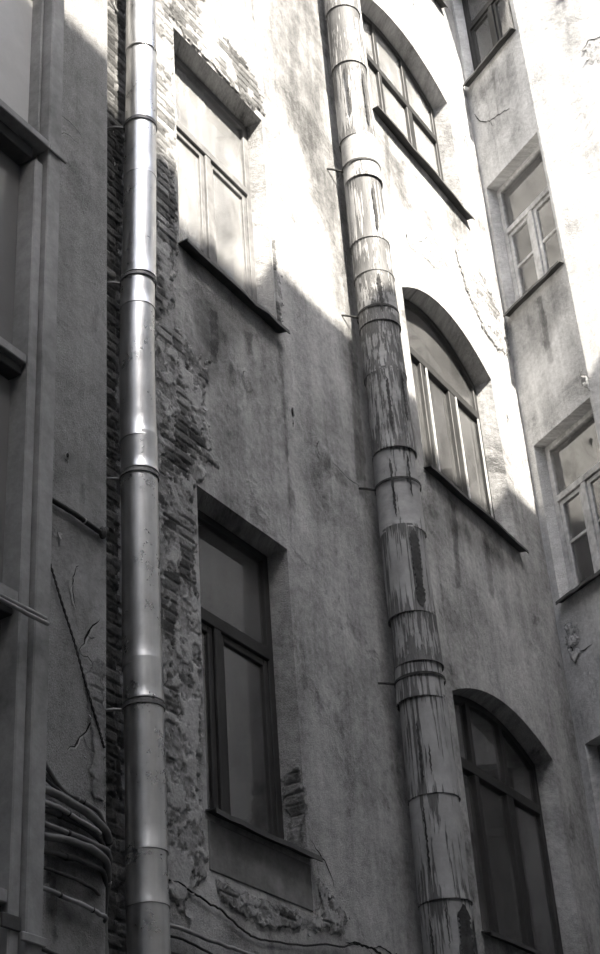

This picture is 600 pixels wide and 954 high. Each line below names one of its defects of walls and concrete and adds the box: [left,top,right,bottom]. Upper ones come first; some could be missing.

flaking render [455,238,509,355]
flaking render [84,0,127,954]
flaking render [155,0,352,937]
crack [79,620,100,666]
crack [67,723,93,752]
crack [346,941,397,954]